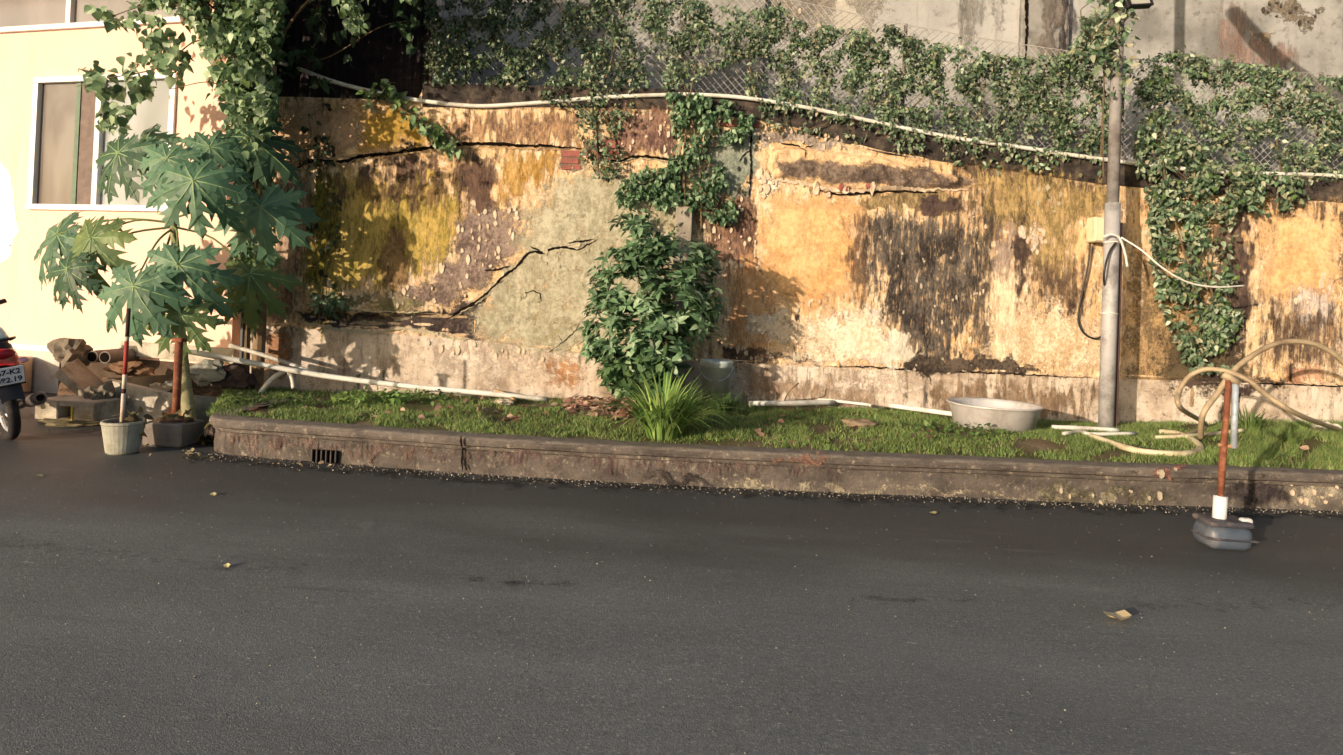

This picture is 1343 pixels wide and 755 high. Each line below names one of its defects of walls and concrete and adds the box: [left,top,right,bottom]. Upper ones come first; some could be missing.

damp [772,0,883,56]
peeling [1249,0,1325,43]
peeling [0,162,19,263]
damp [269,98,582,341]
crack [296,142,682,186]
crack [343,239,598,321]
damp [722,161,1106,409]
damp [1122,191,1343,420]